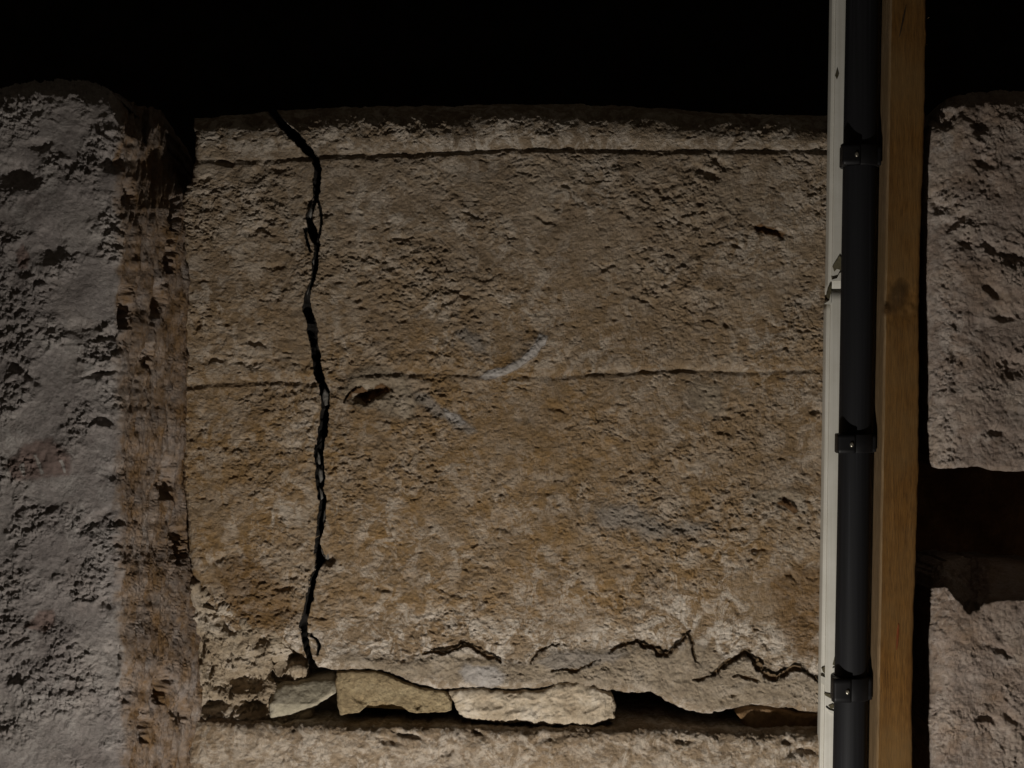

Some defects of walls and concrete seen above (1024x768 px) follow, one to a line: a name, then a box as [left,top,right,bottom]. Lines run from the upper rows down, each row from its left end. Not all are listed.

crack [271,108,330,669]
crack [423,644,502,662]
spalling [340,639,834,715]
crack [530,630,818,682]